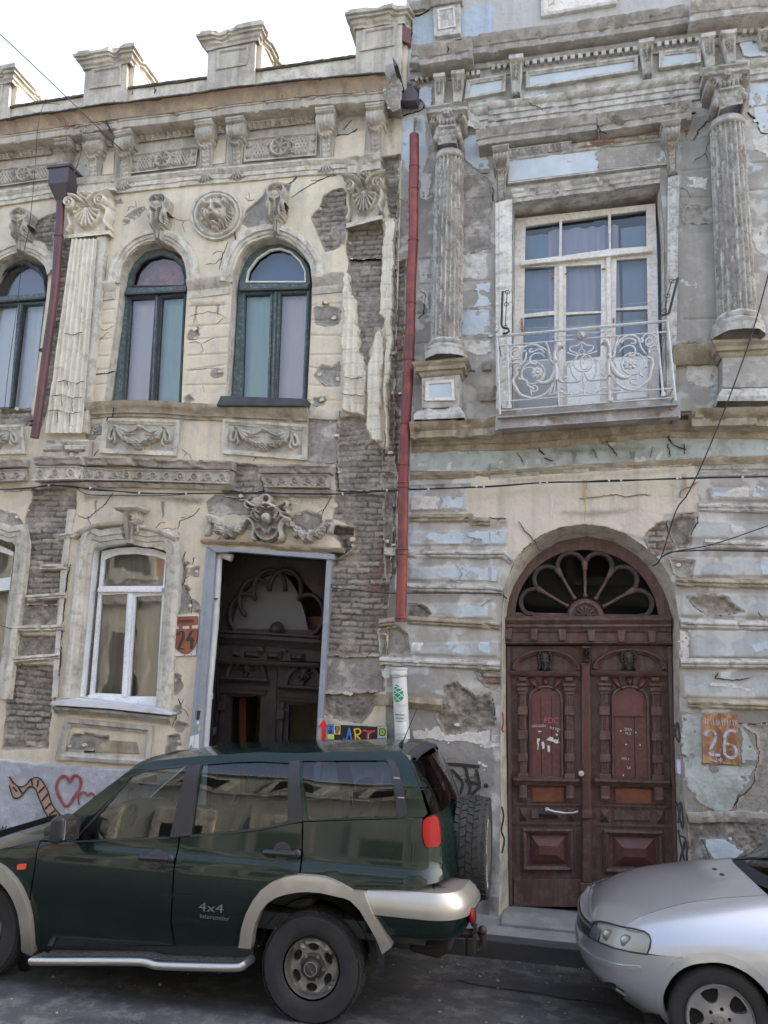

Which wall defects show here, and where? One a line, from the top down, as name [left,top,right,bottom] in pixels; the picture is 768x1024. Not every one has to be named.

crack [288,175,336,198]
flaking render [462,127,493,355]
flaking render [291,83,434,723]
crack [156,508,200,585]
crack [467,517,543,551]
flaking render [643,513,699,577]
flaking render [0,488,77,750]
flaking render [687,594,744,616]
flaking render [413,670,503,750]
peeling [681,710,768,861]